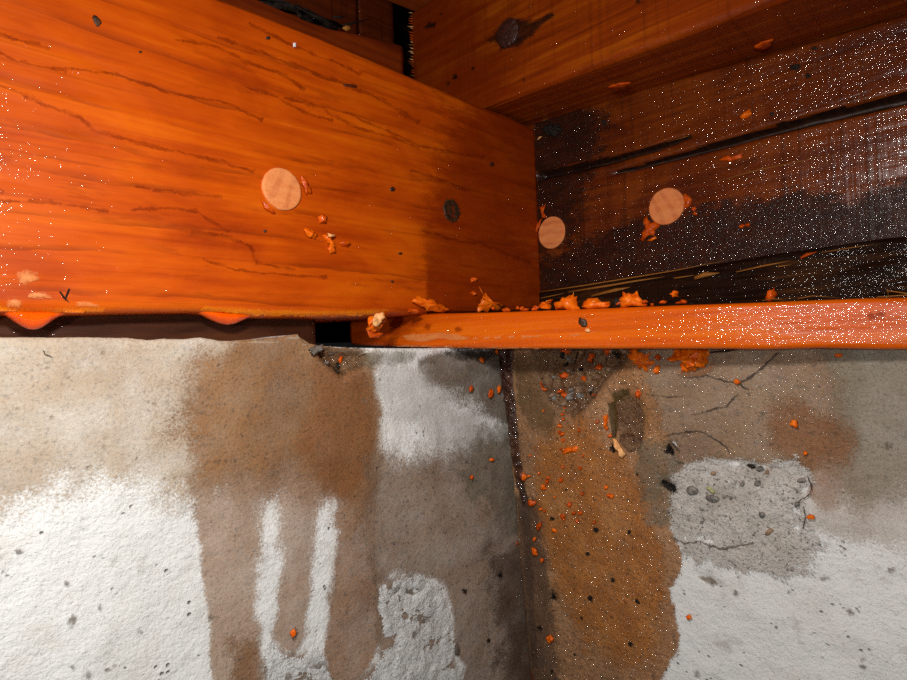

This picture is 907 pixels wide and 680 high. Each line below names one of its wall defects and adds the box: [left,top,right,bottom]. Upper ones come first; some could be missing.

crack [654,352,779,464]
leakage [637,348,907,514]
leakage [0,334,537,680]
rust [509,349,683,680]
crack [670,537,754,550]
spalling [665,454,843,593]
crack [797,476,812,529]